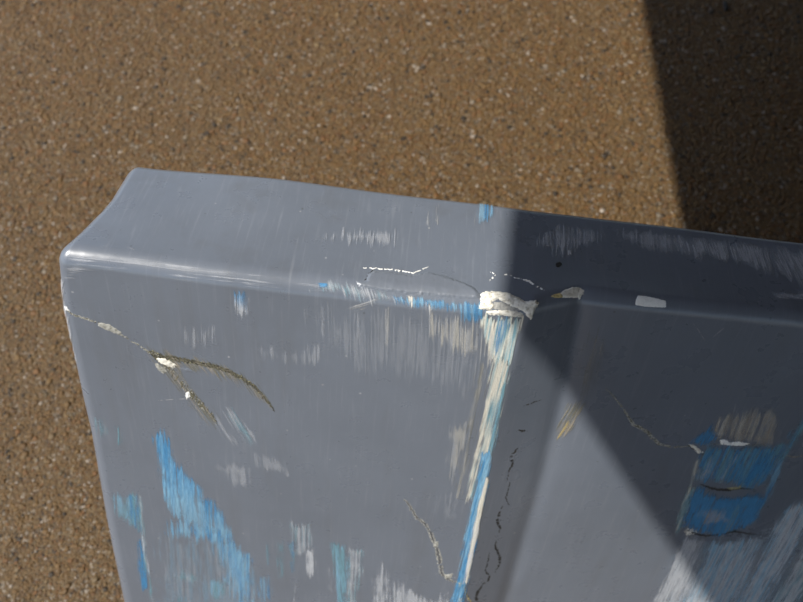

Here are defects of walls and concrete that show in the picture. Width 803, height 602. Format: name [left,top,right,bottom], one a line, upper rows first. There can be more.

peeling [479,291,539,320]
peeling [552,287,584,299]
peeling [635,295,666,308]
crack [64,306,275,422]
crack [605,388,802,466]
crack [700,484,752,492]
crack [404,430,525,602]
crack [684,528,760,537]